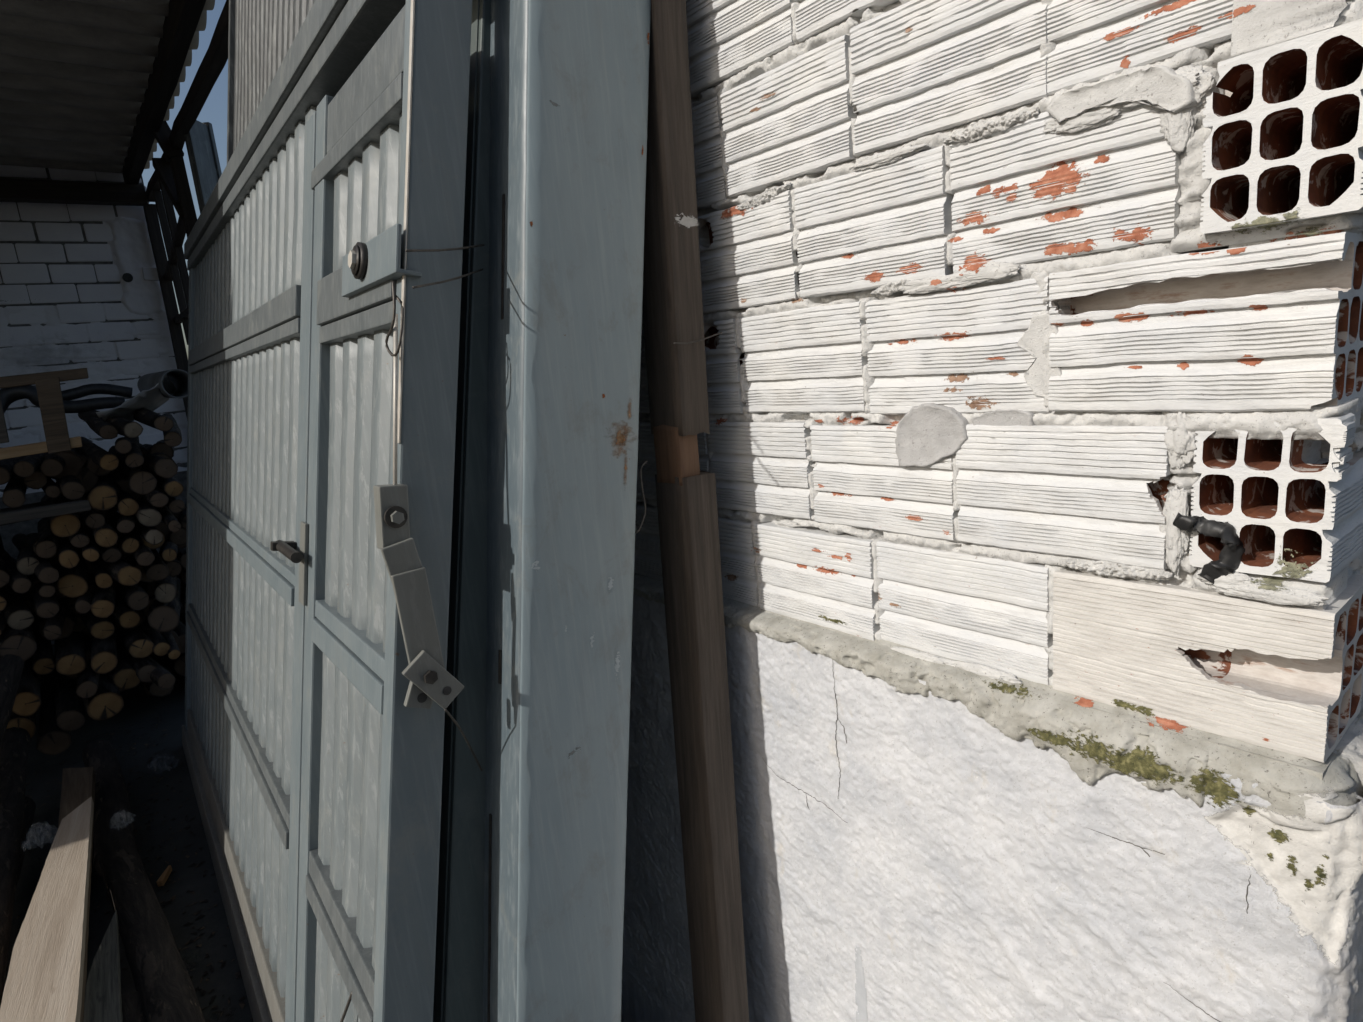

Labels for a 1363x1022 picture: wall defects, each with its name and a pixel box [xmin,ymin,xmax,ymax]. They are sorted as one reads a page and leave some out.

peeling [948,155,1109,243]
peeling [1044,239,1097,256]
peeling [1112,223,1153,245]
peeling [864,250,991,295]